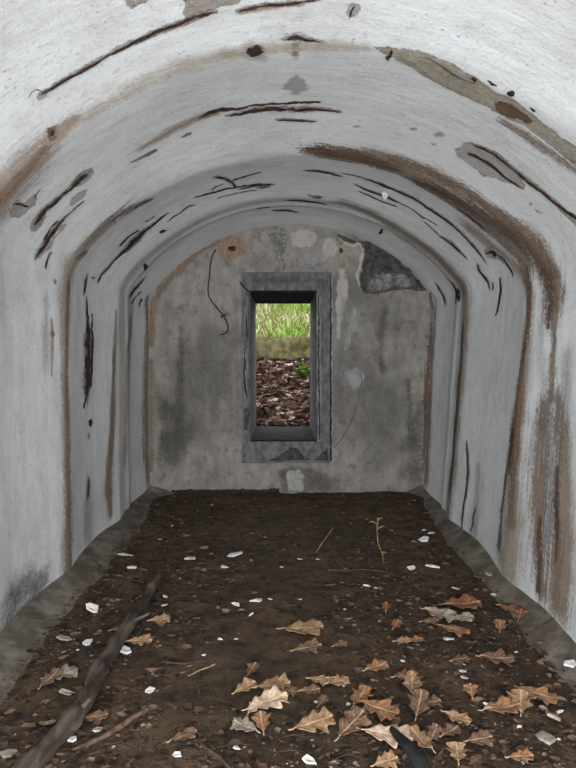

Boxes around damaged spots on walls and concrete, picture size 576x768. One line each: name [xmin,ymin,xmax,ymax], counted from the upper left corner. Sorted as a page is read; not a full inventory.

crack [29,0,317,100]
spalling [183,0,240,18]
spalling [226,44,264,57]
spalling [375,47,576,172]
crack [83,172,327,296]
spalling [261,226,426,348]
crack [304,170,513,316]
corrosion [51,199,154,573]
peeling [346,368,364,390]
corrosion [301,143,574,618]
crack [461,442,476,532]